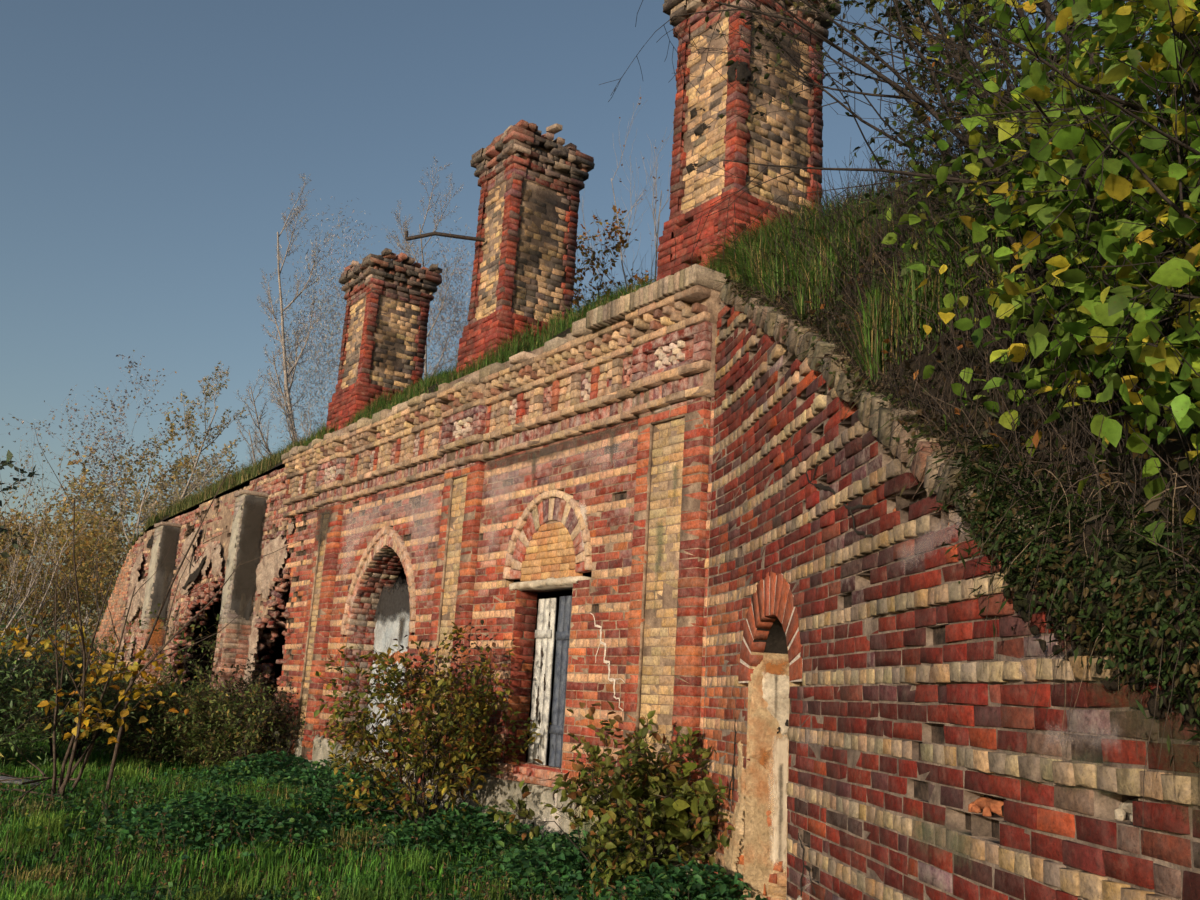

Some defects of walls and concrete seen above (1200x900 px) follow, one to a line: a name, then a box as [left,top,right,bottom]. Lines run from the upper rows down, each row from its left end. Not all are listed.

peeling [114,536,154,674]
spalling [164,528,226,707]
spalling [241,521,294,715]
crack [590,613,625,711]